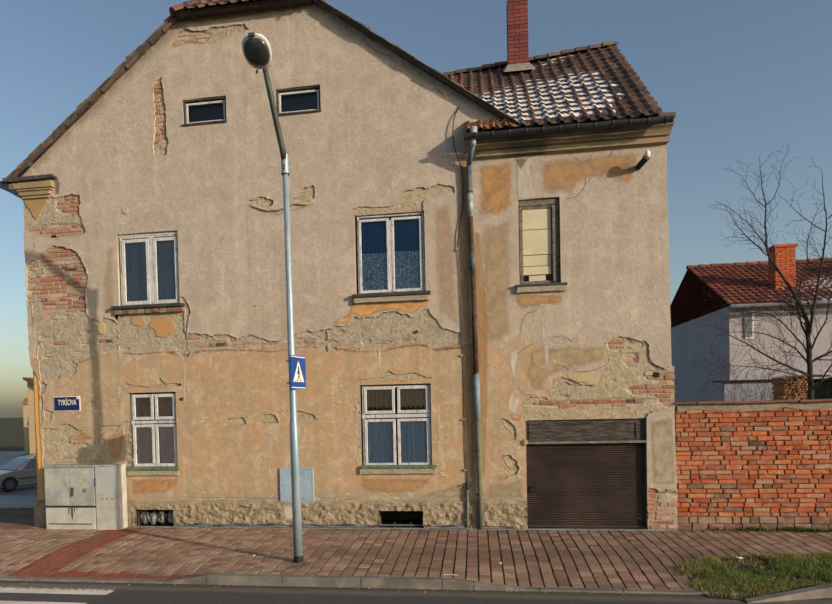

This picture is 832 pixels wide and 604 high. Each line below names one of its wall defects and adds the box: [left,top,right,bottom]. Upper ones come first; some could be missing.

spalling [169,23,250,48]
spalling [152,77,169,157]
spalling [294,184,316,203]
spalling [351,183,455,218]
peeling [542,155,636,193]
spalling [24,193,473,471]
spalling [494,335,675,481]
spalling [647,487,678,530]